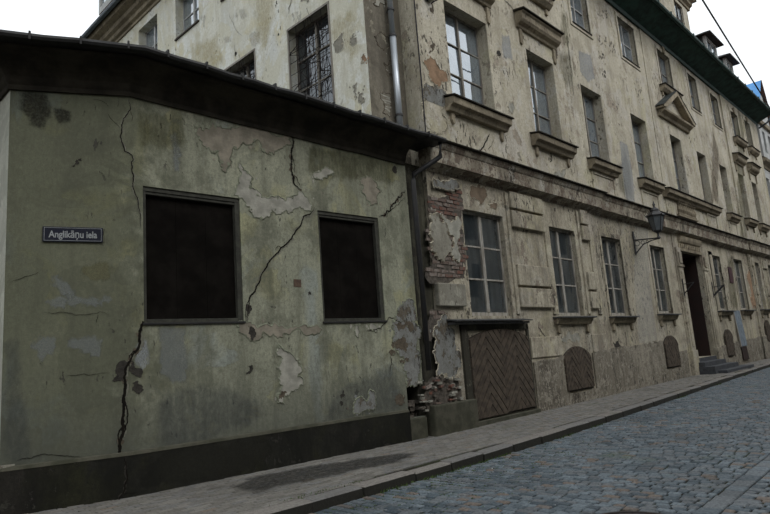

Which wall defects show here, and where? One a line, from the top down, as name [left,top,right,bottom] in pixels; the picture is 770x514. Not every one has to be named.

mould [22,91,69,127]
peeling [420,43,449,135]
crack [93,99,142,225]
peeling [193,120,314,220]
crack [245,209,315,321]
crack [289,137,302,191]
crack [379,191,405,217]
flaking render [425,177,502,284]
crack [117,321,144,499]
peeling [275,343,307,404]
peeling [340,389,377,416]
peeling [350,298,464,418]